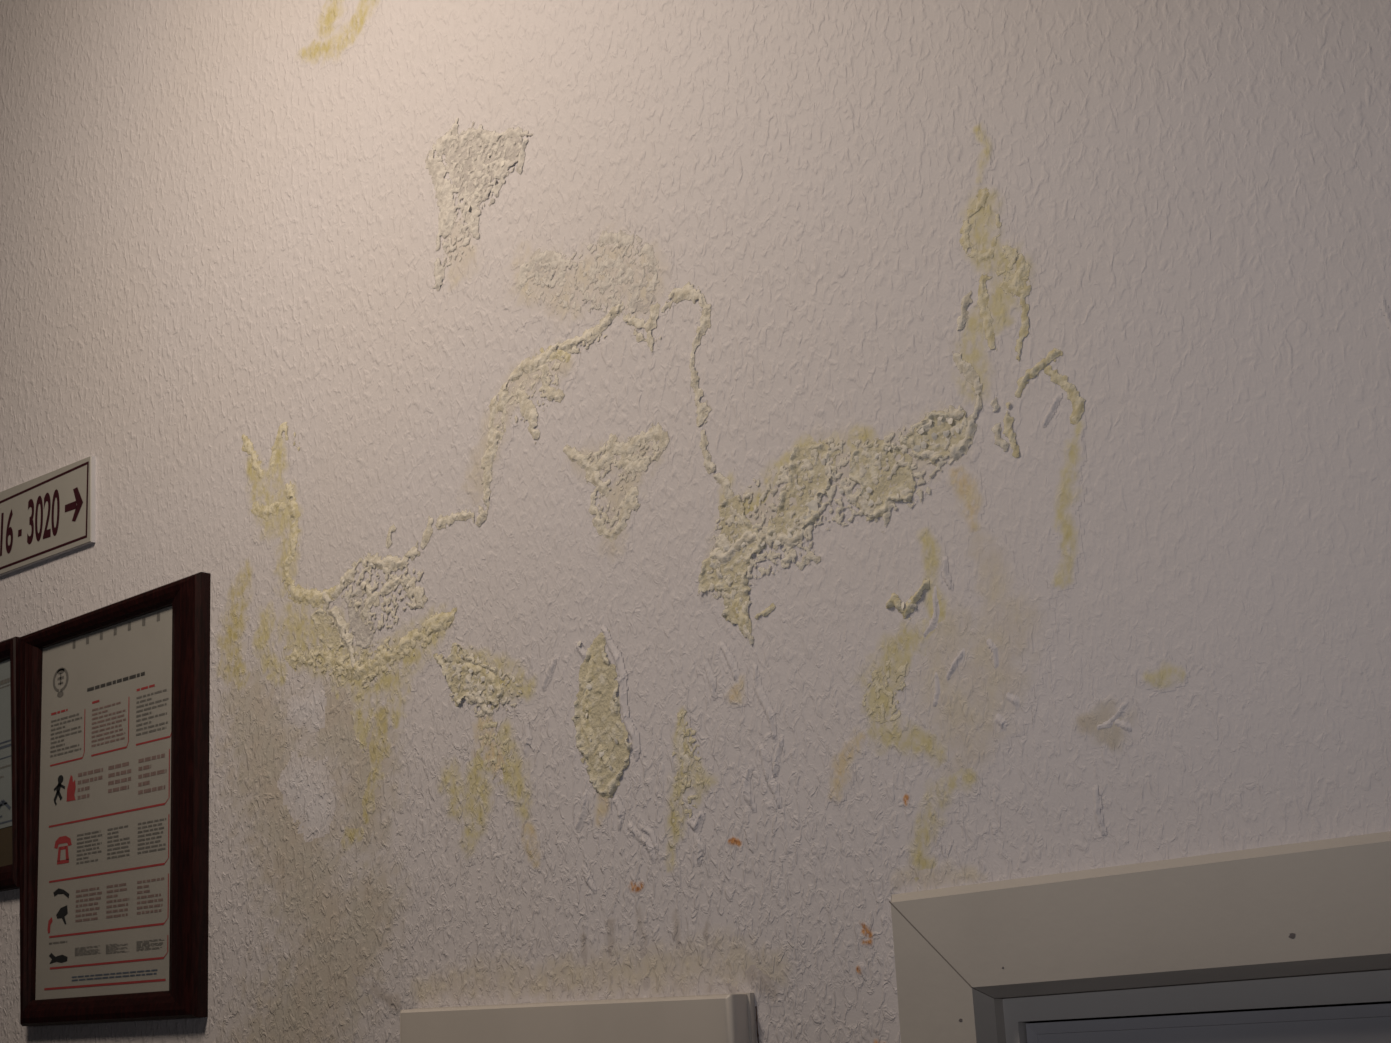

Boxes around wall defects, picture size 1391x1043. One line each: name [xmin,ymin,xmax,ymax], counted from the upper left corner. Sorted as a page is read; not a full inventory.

flaking render [571,624,640,833]
flaking render [240,118,1085,753]
leakage [825,415,1087,894]